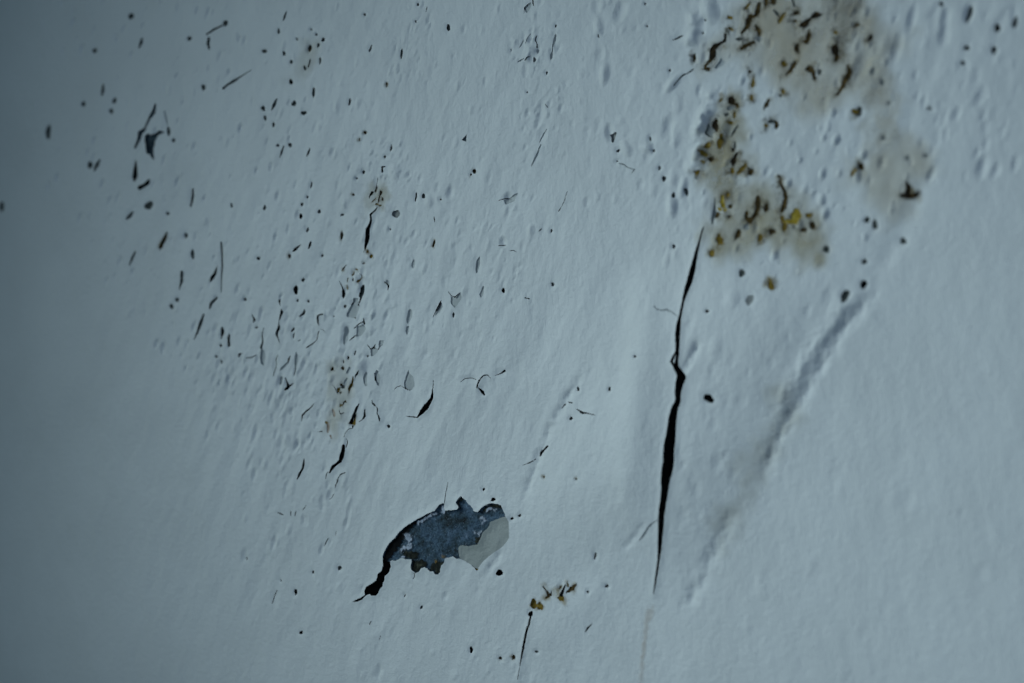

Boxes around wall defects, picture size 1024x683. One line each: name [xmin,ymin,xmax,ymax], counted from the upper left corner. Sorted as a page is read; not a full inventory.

damp [692,0,823,81]
damp [831,22,860,97]
peeling [132,103,175,190]
damp [694,70,816,257]
damp [900,180,921,199]
peeling [194,242,223,340]
peeling [215,299,310,385]
peeling [333,298,384,357]
peeling [363,370,380,386]
peeling [435,293,462,318]
crack [639,226,704,594]
peeling [353,483,509,602]